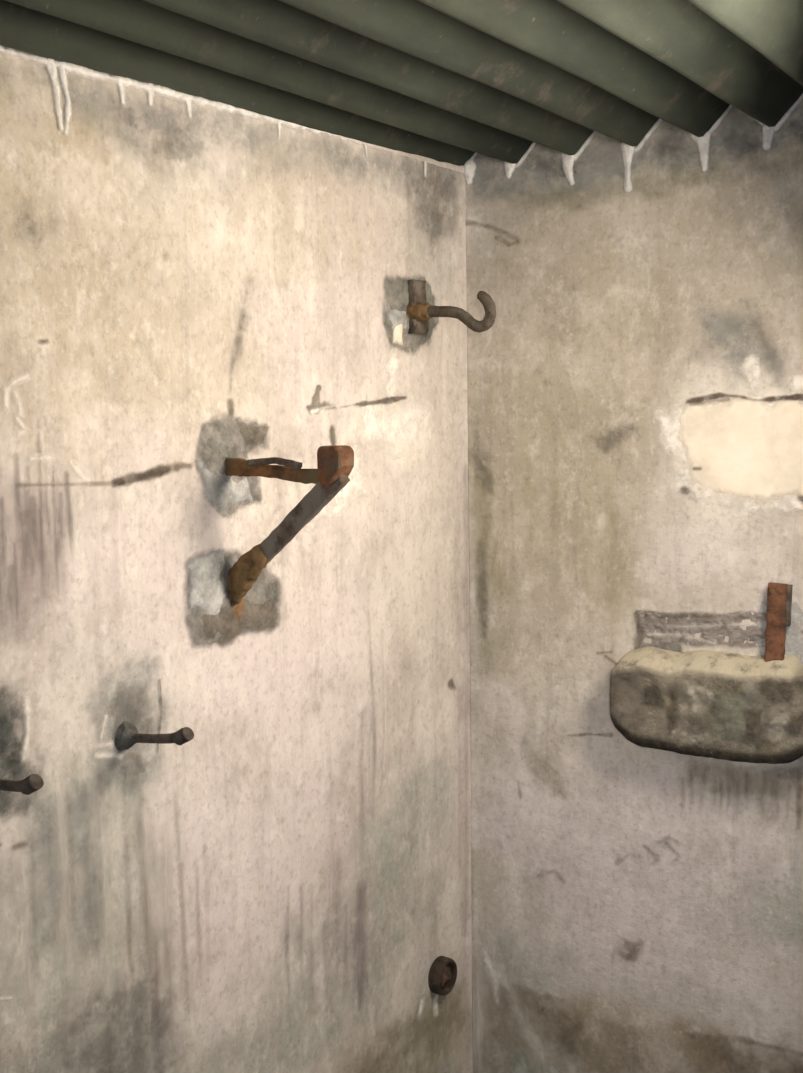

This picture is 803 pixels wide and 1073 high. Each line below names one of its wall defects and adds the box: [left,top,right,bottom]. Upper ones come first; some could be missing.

damp [471,157,496,194]
damp [503,144,635,190]
crack [687,393,803,405]
peeling [241,424,269,443]
peeling [656,355,803,517]
peeling [189,551,278,643]
damp [0,688,33,813]
damp [418,996,438,1015]